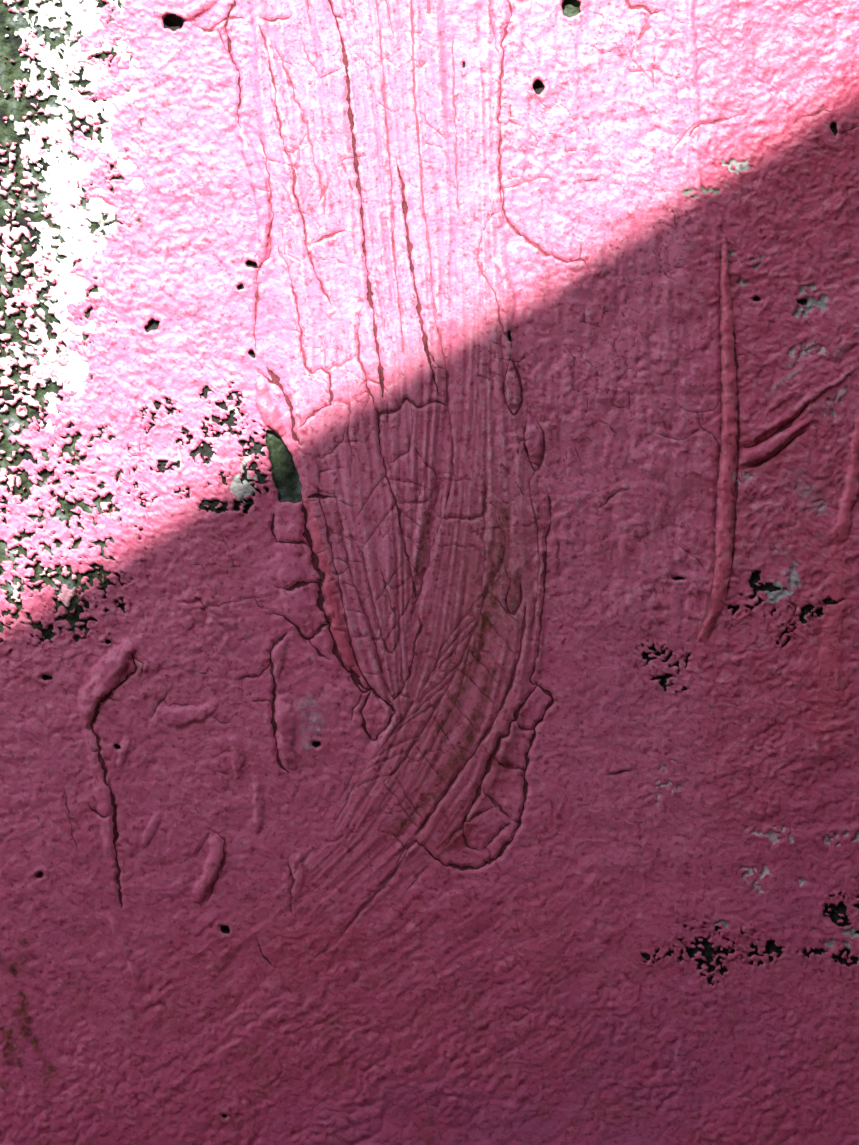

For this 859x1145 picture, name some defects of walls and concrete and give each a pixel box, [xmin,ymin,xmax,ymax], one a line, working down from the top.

peeling [0,0,286,654]
crack [189,0,809,958]
peeling [727,561,844,647]
peeling [642,641,691,692]
crack [151,692,230,724]
crack [64,653,144,908]
peeling [745,826,794,845]
peeling [737,865,772,894]
peeling [642,921,783,986]
peeling [803,892,859,967]